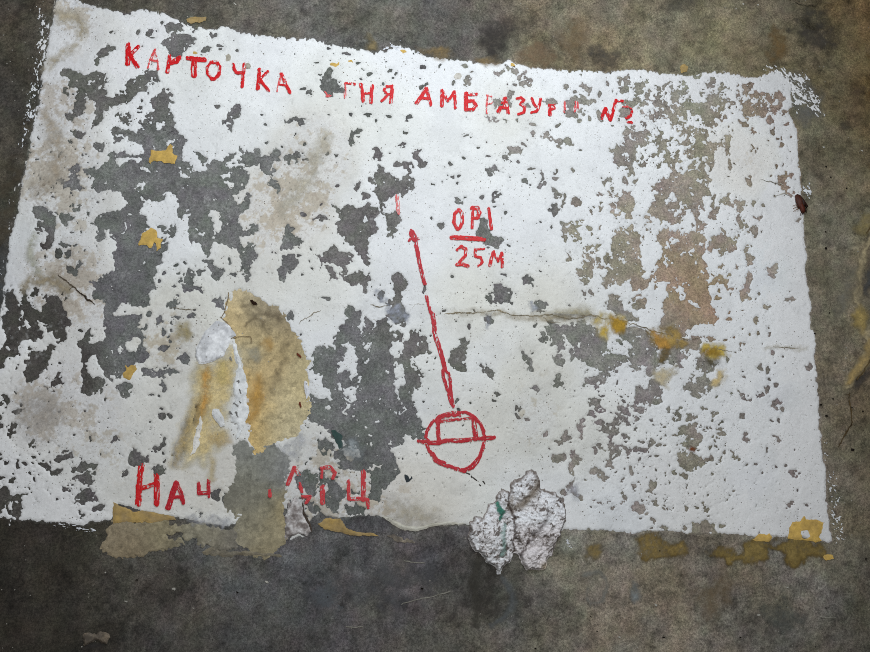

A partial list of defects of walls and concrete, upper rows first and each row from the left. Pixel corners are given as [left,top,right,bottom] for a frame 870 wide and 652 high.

peeling [452,64,474,87]
peeling [485,64,533,123]
peeling [0,45,436,560]
peeling [448,324,471,372]
crack [445,309,696,346]
peeling [471,74,801,535]